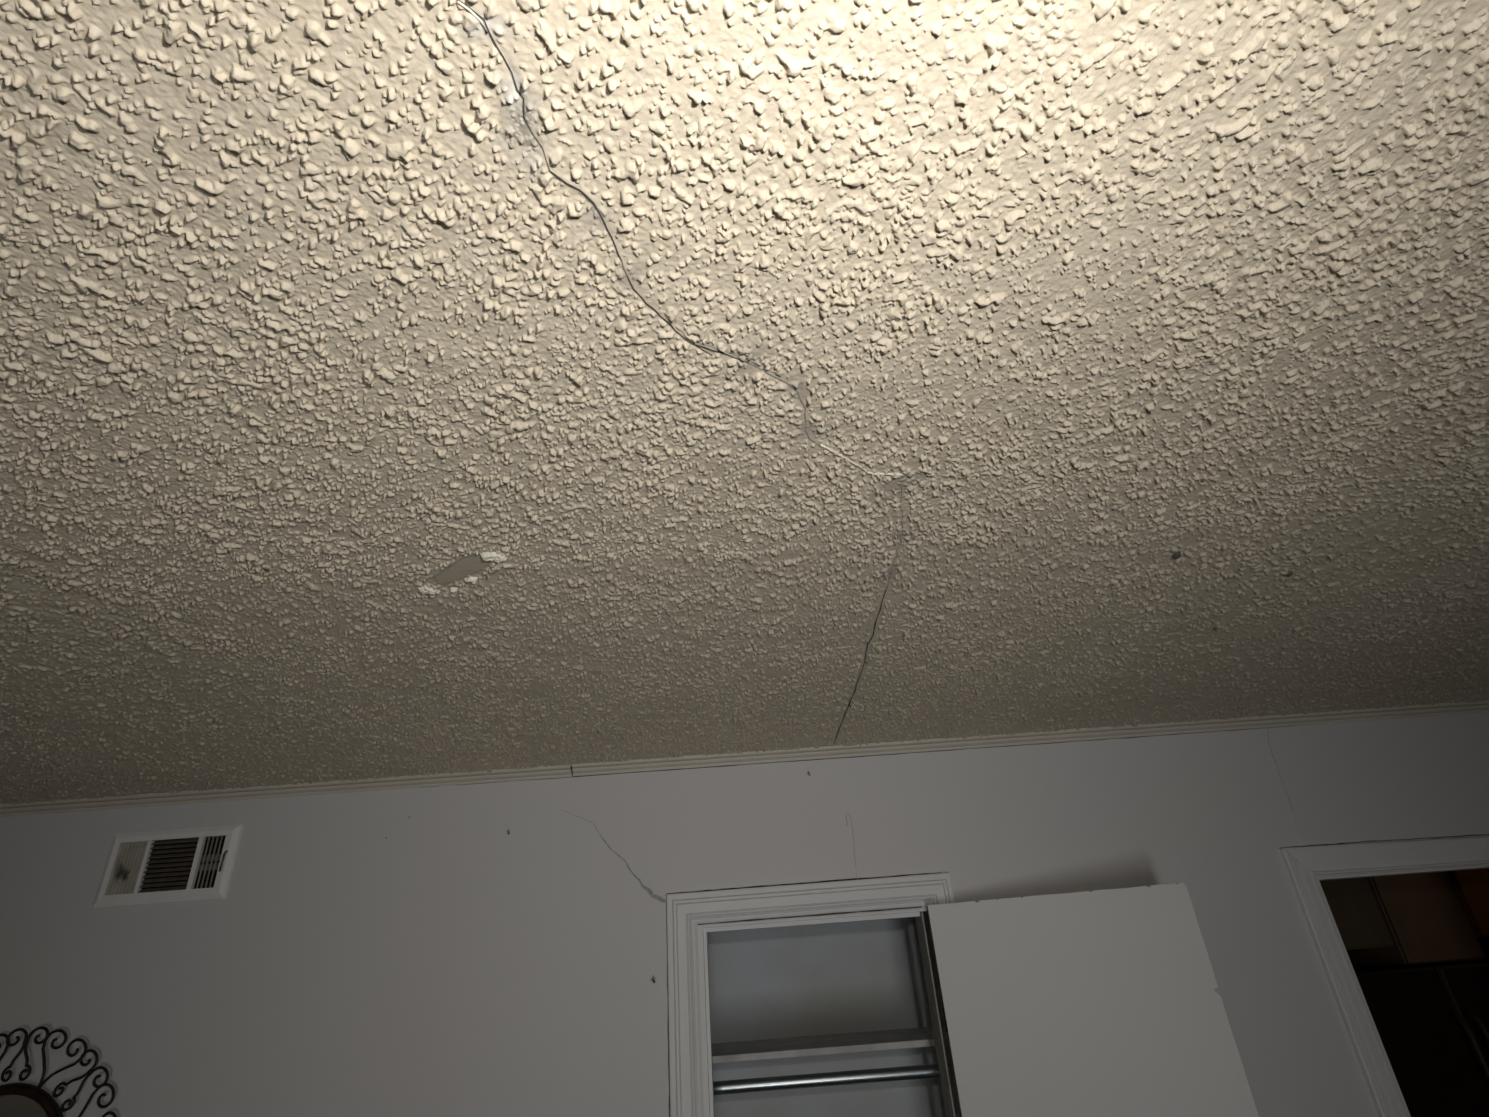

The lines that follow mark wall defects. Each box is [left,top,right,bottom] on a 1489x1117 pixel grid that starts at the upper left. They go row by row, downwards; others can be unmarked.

crack [457,0,904,743]
peeling [418,576,478,595]
peeling [480,552,508,563]
crack [564,811,666,903]